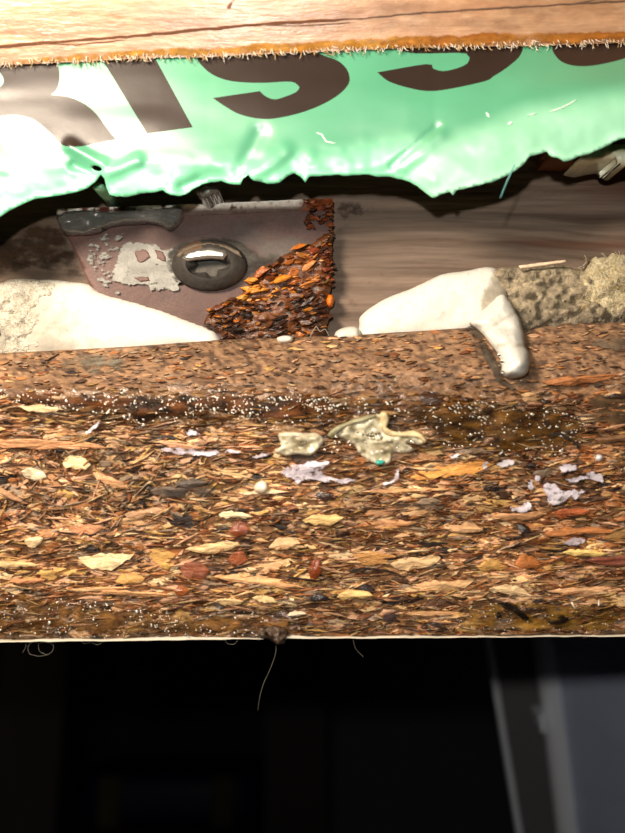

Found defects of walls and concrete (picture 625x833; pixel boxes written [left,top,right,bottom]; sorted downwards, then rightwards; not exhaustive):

crack [0,0,625,48]
corrosion [204,198,337,340]
damp [21,392,50,402]
damp [60,395,322,424]
damp [409,409,582,451]